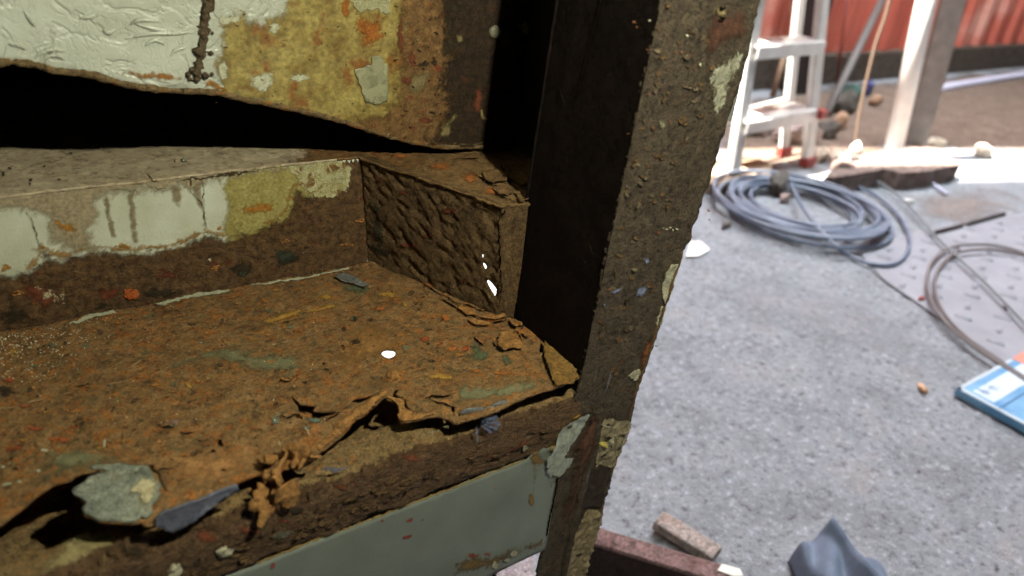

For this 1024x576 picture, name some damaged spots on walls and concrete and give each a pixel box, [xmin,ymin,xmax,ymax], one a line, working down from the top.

spalling [0,64,116,92]
peeling [355,56,389,105]
peeling [710,53,743,116]
rust [0,0,531,357]
peeling [288,161,352,198]